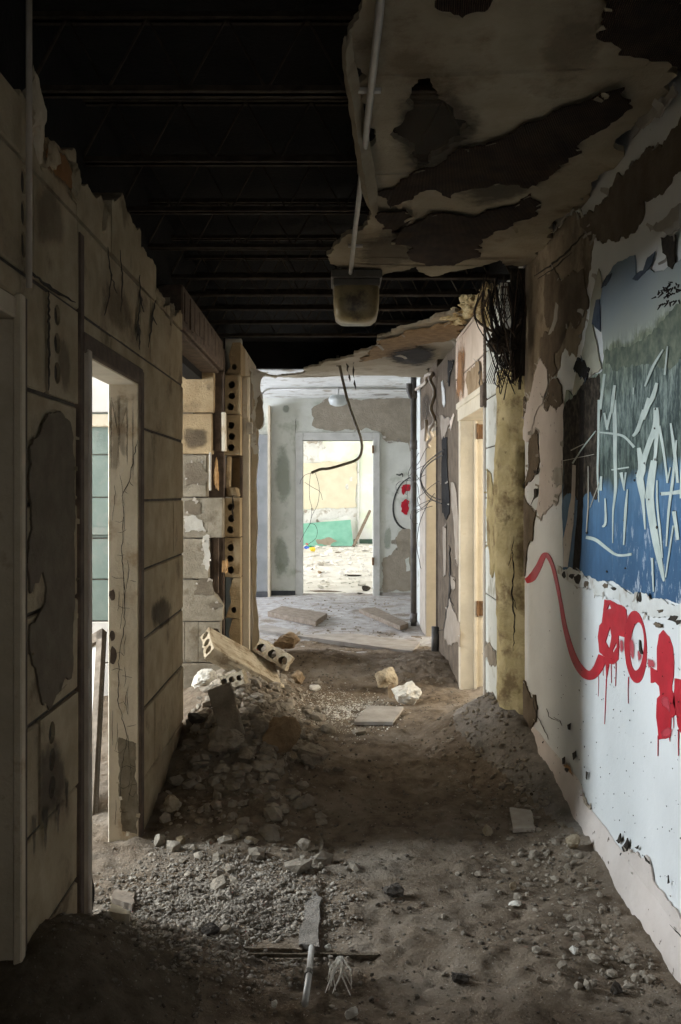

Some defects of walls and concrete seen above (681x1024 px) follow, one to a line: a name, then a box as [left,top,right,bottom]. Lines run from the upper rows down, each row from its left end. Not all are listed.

spalling [22,66,82,204]
crack [104,248,157,350]
spalling [522,117,681,576]
spalling [27,411,80,711]
crack [112,441,138,820]
spalling [303,398,461,647]
spalling [523,680,538,729]